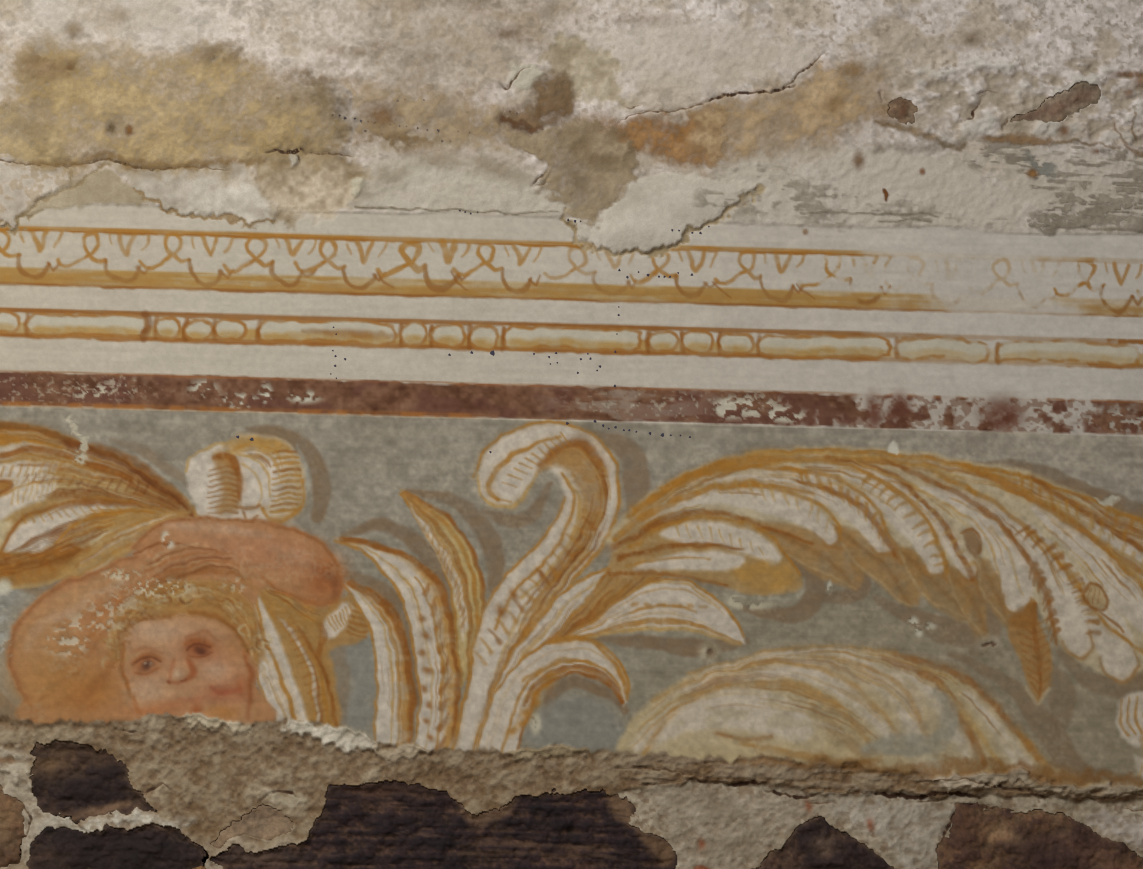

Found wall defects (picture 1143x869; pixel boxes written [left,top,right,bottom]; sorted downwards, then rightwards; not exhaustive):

crack [625,57,819,119]
damp [1118,72,1143,94]
crack [0,158,223,171]
spalling [0,137,403,237]
crack [267,148,349,159]
damp [0,46,638,225]
peeling [972,142,1143,235]
peeling [189,381,273,409]
peeling [652,395,807,424]
spalling [0,713,1143,863]
crack [621,767,1045,838]
crack [1086,792,1143,811]